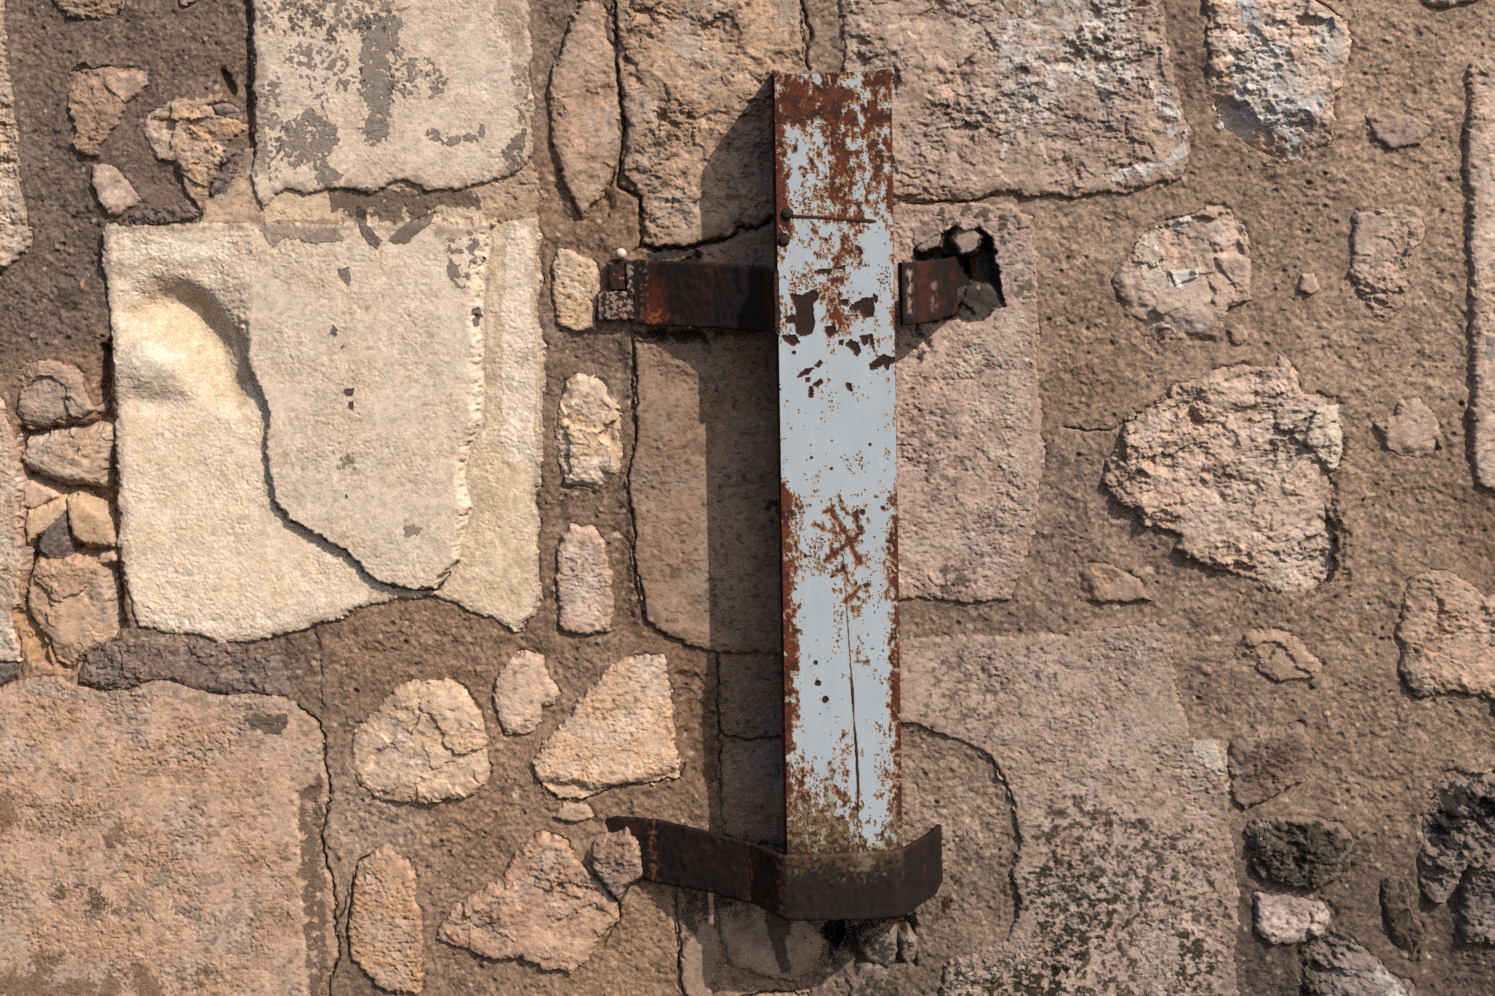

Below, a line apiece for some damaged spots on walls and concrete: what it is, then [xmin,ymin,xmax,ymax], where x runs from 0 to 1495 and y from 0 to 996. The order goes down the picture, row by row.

corrosion [630,327,710,345]
corrosion [765,71,902,855]
corrosion [915,327,933,362]
peeling [911,223,1047,597]
crack [299,705,375,991]